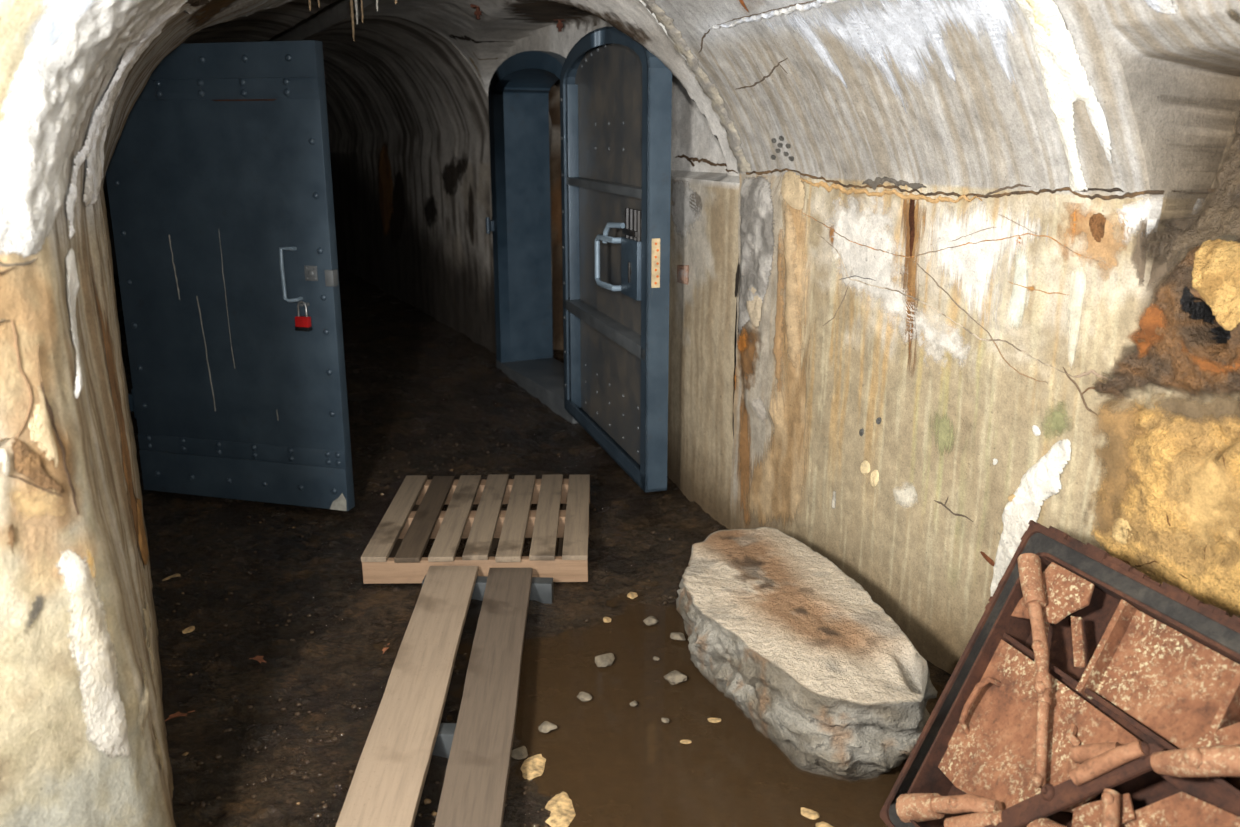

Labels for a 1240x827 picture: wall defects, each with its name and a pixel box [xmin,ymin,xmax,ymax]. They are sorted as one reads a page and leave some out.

water stain [1145,0,1178,14]
spalling [7,524,15,554]
crack [0,258,38,275]
spalling [0,437,64,517]
crack [0,319,79,515]
rust [902,199,926,368]
crack [675,154,1214,415]
spalling [1021,109,1240,626]